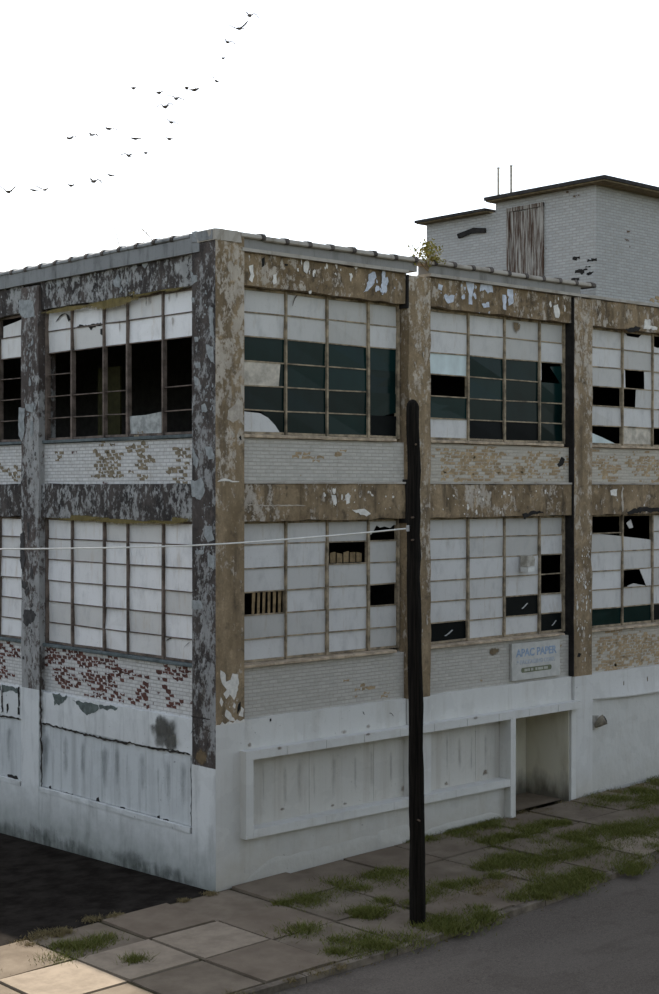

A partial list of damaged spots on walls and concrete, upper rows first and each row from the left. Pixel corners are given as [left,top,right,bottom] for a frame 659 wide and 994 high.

peeling [364,271,397,295]
peeling [438,281,516,315]
peeling [190,272,236,431]
peeling [18,403,36,441]
flaking render [91,431,156,484]
peeling [323,484,394,516]
flaking render [440,446,565,515]
peeling [166,446,215,619]
peeling [0,522,36,715]
flaking render [45,647,191,715]
peeling [220,670,244,721]
damp [152,717,176,750]